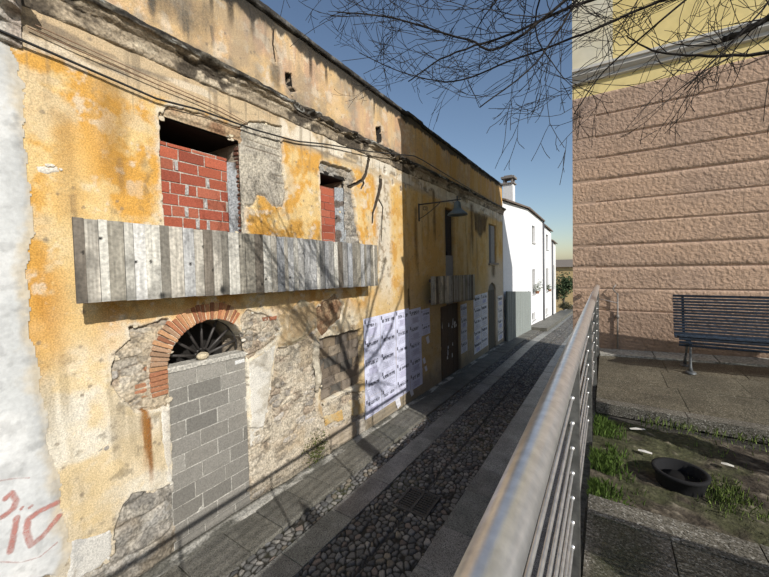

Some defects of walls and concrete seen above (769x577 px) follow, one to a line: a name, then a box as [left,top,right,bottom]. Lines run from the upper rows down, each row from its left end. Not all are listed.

damp [228,0,272,24]
peeling [158,107,285,233]
spalling [67,319,176,577]
corrosion [140,409,153,469]
spalling [239,294,365,503]